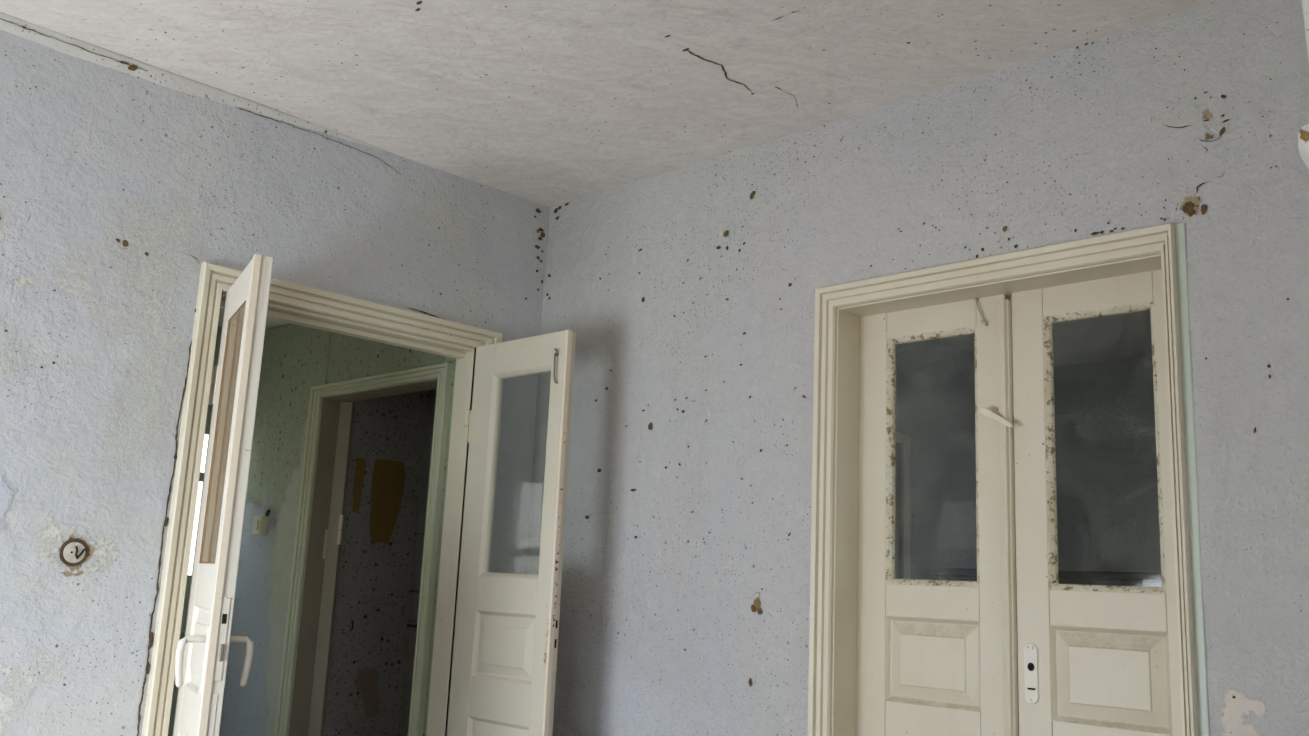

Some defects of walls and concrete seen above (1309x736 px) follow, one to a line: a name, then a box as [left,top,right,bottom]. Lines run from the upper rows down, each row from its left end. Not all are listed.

crack [665,35,798,107]
peeling [352,458,406,544]
peeling [1220,688,1266,736]